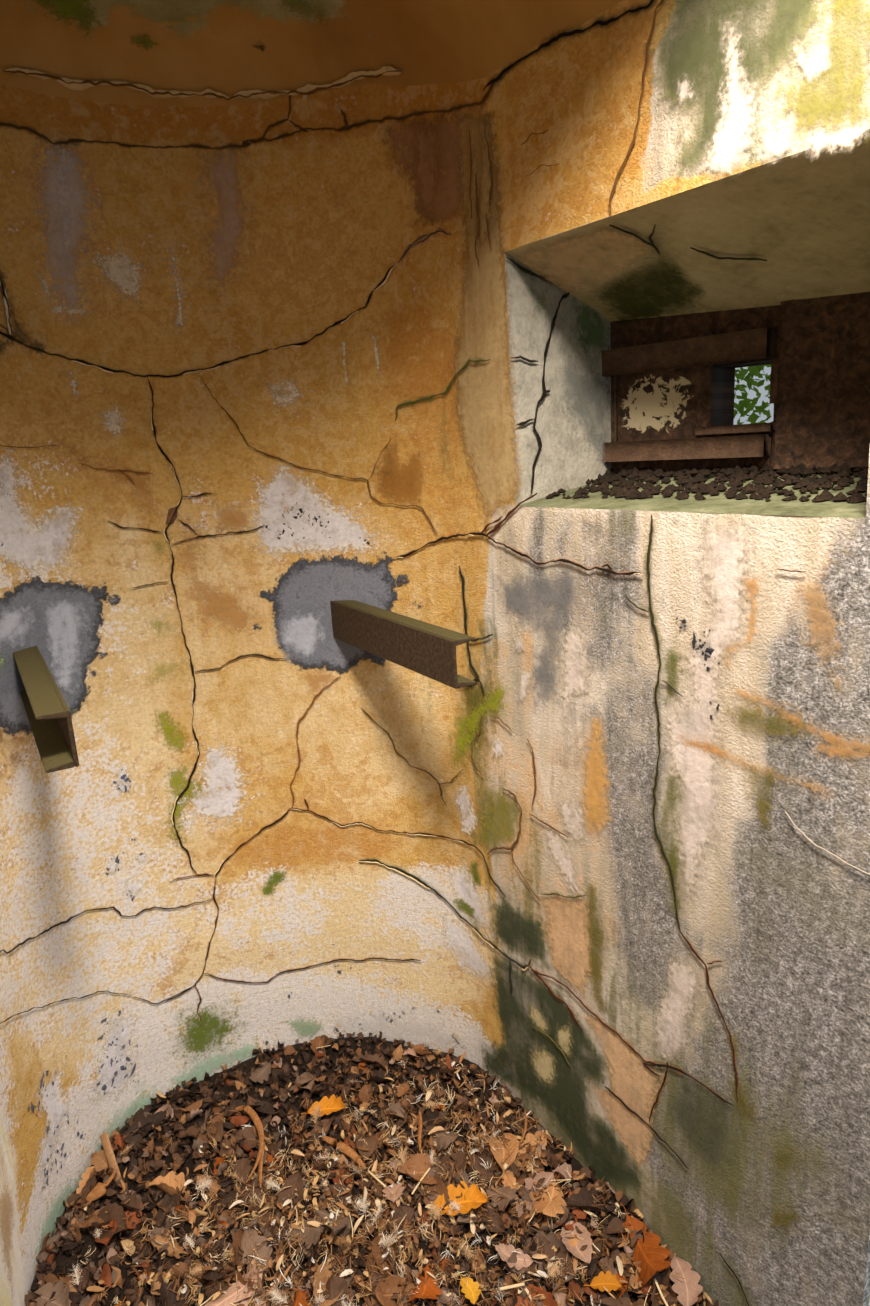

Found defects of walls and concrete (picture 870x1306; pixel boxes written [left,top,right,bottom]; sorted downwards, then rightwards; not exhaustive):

crack [0,0,767,1169]
water stain [491,897,549,969]